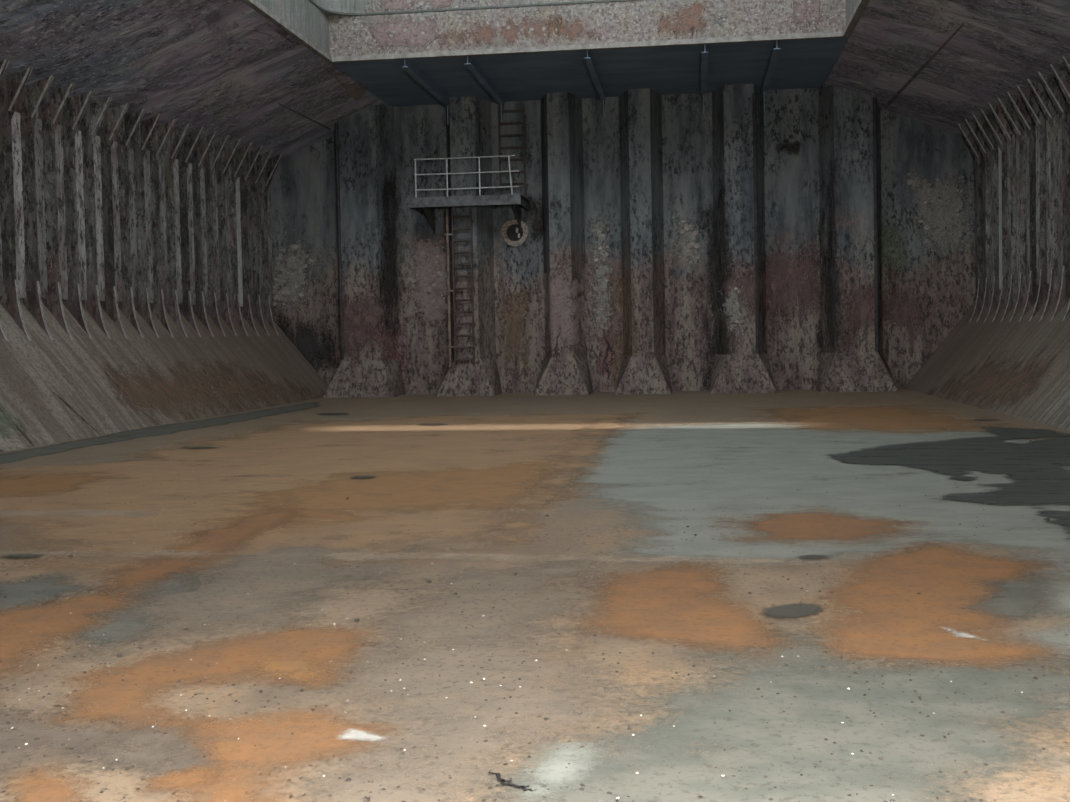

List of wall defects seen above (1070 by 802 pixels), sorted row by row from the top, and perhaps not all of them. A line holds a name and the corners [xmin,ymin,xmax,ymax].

peeling [377,0,454,12]
corrosion [439,15,595,46]
corrosion [658,0,707,38]
corrosion [0,414,636,581]
corrosion [723,512,911,543]
water stain [308,419,1070,802]
corrosion [825,543,1048,665]